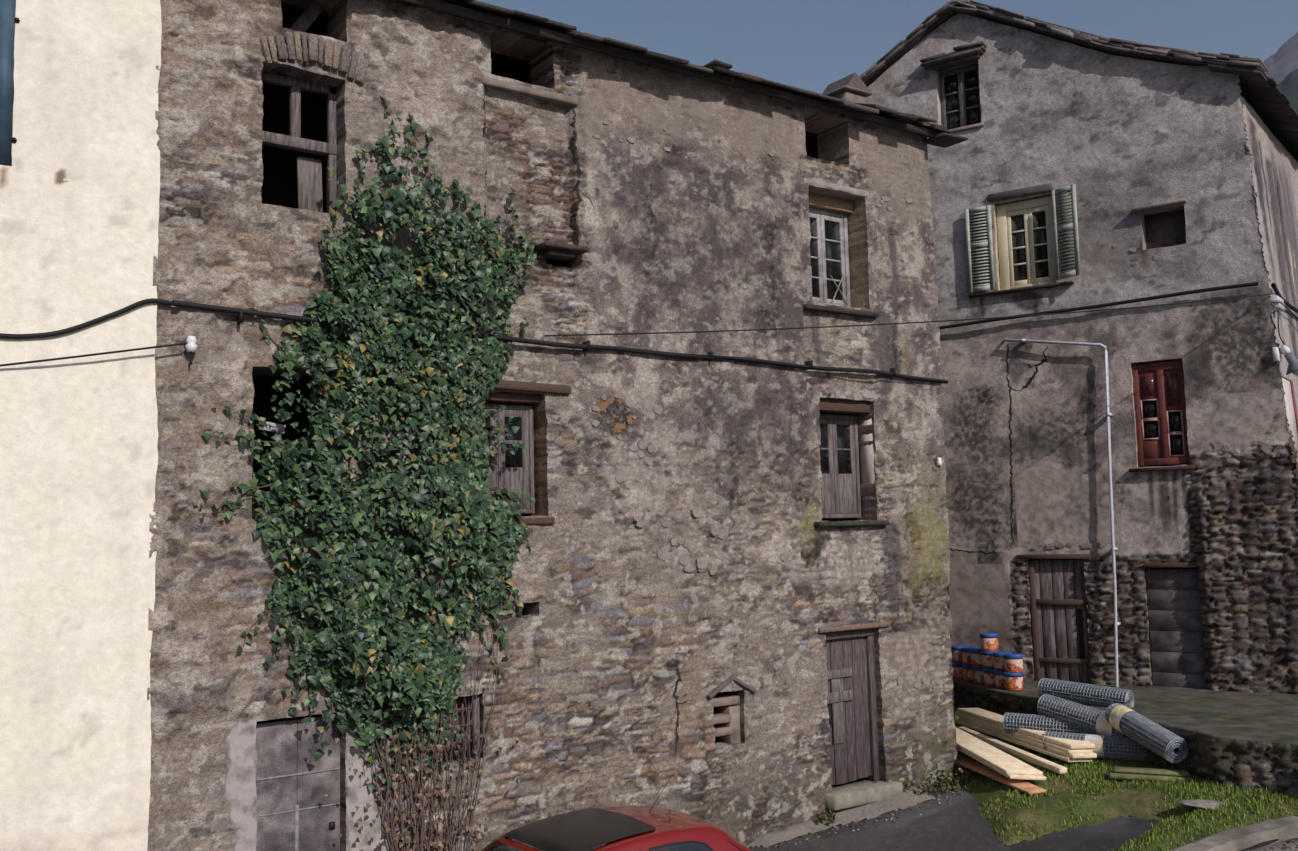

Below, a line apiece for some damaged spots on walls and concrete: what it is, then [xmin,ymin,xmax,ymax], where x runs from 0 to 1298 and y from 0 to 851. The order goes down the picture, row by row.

crack [949,345,1048,554]
crack [669,656,690,756]